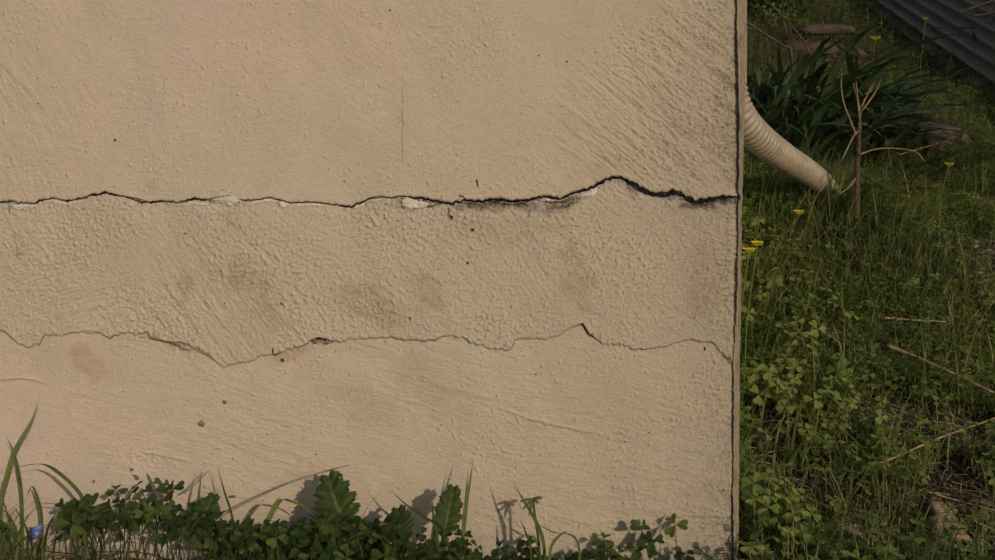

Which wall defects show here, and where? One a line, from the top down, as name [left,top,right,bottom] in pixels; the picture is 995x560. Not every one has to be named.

crack [0,176,735,241]
crack [10,332,334,368]